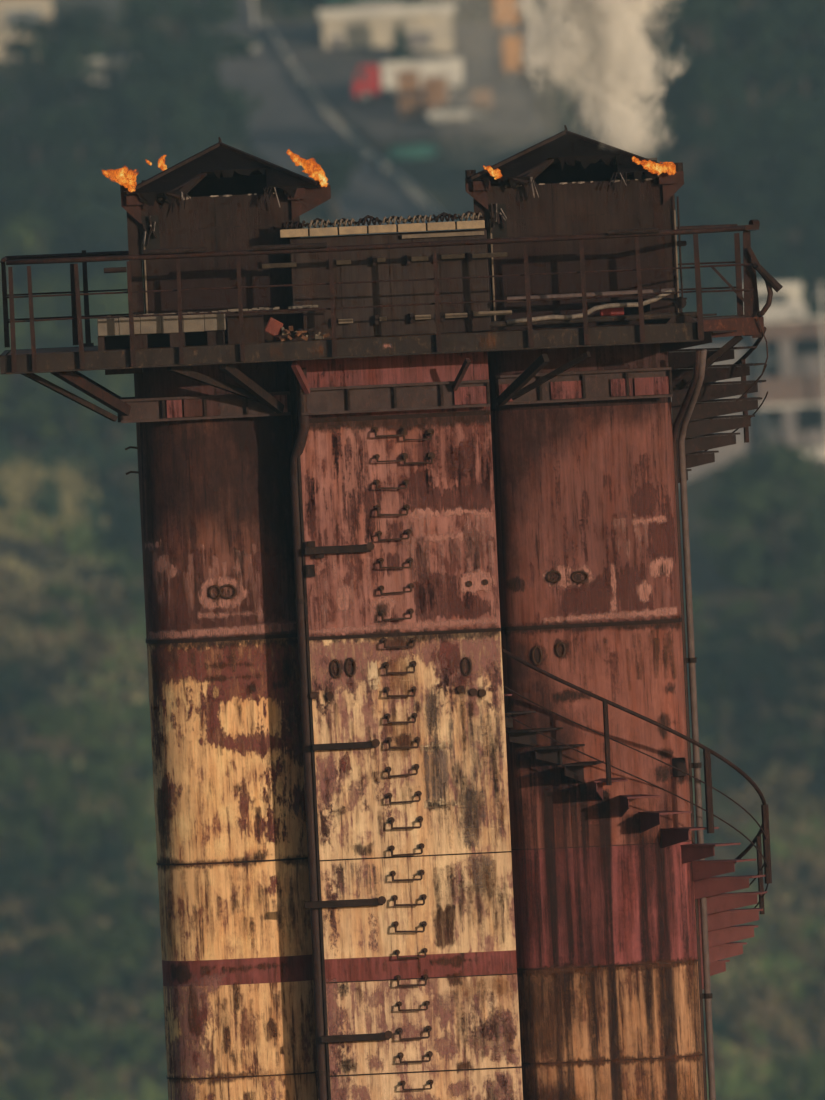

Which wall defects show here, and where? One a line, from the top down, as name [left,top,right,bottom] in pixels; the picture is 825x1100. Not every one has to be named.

peeling [144,539,193,602]
corrosion [198,548,247,610]
peeling [305,475,354,627]
peeling [330,428,496,622]
peeling [147,557,502,854]
corrosion [157,779,267,879]
corrosion [168,1026,259,1085]
corrosion [171,962,287,1036]
corrosion [267,1018,280,1041]
peeling [327,978,371,1100]
peeling [434,992,519,1100]
corrosion [521,1052,700,1072]